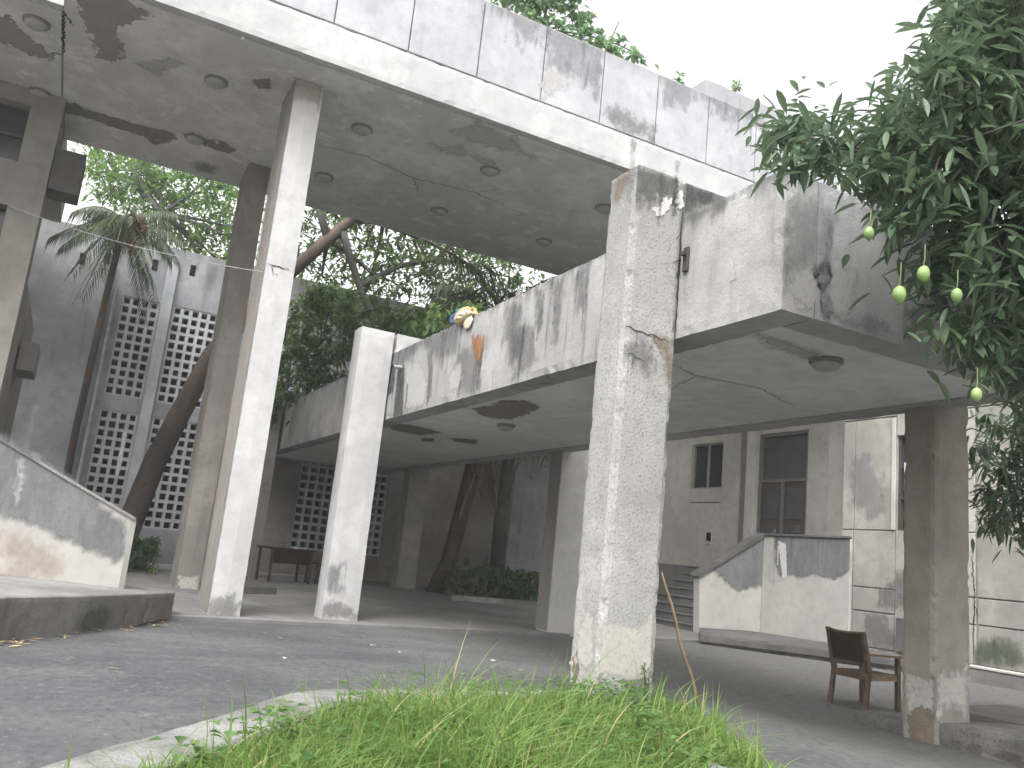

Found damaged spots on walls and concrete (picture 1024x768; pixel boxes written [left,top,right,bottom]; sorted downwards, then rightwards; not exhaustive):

peeling [0,14,56,61]
peeling [77,0,183,75]
peeling [66,102,237,153]
spalling [652,191,684,216]
water stain [636,164,715,214]
crack [625,212,791,405]
water stain [389,325,479,417]
rust [471,335,484,361]
peeling [473,400,544,421]
water stain [0,436,124,560]
water stain [713,533,850,591]
water stain [975,639,1022,665]